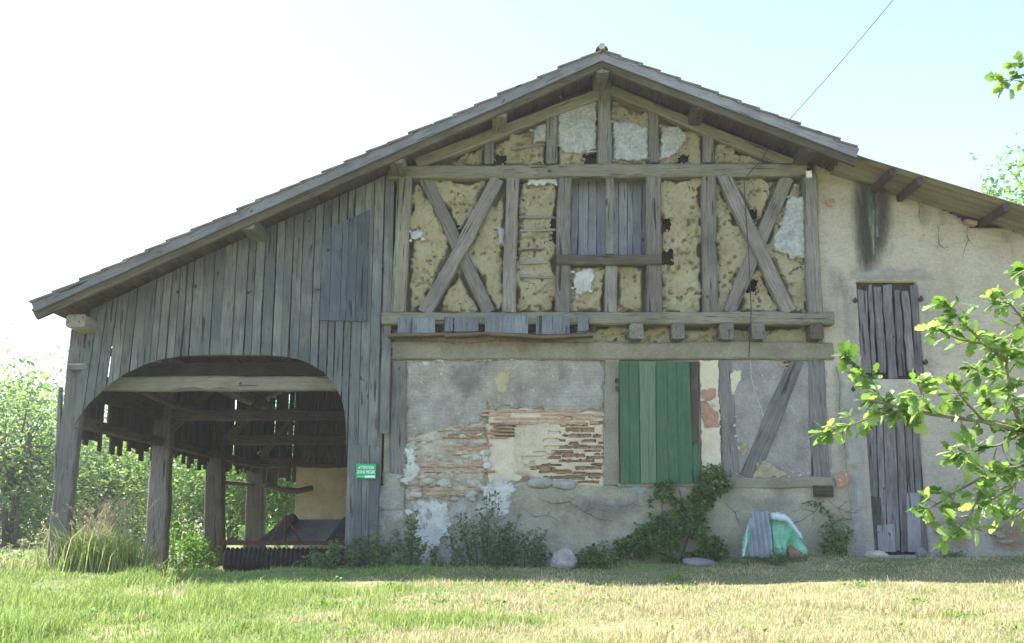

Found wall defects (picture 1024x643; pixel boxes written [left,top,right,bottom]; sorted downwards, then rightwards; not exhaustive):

damp [858,181,887,267]
flaking render [701,388,720,428]
flaking render [400,408,604,564]
crack [524,494,645,521]